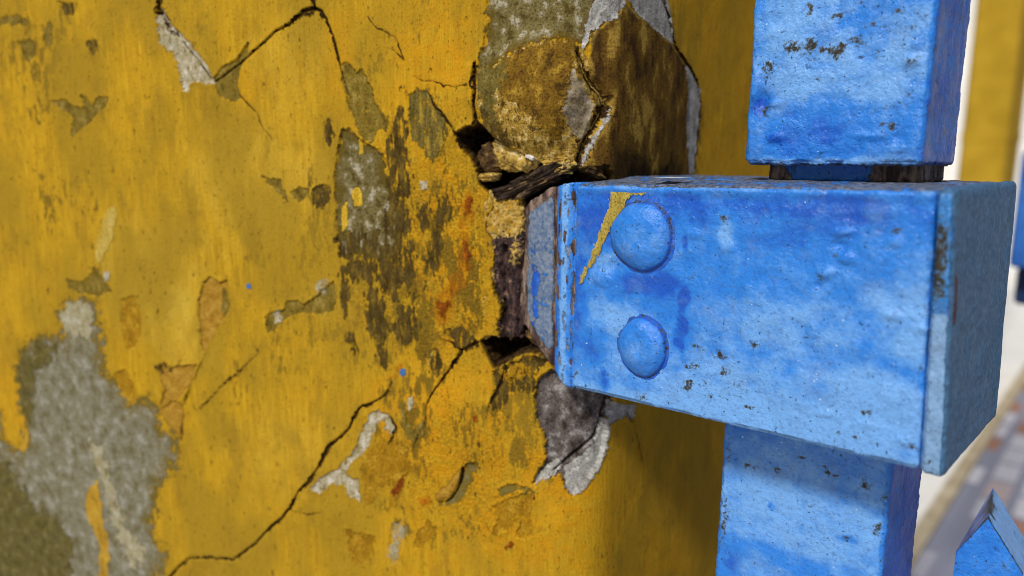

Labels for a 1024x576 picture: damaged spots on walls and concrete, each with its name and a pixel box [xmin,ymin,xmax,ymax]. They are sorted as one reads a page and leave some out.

flaking render [153,0,249,102]
crack [215,0,350,139]
crack [367,16,404,59]
flaking render [475,0,603,169]
water stain [333,86,453,370]
flaking render [0,207,197,576]
peeling [197,277,230,351]
peeling [265,279,336,333]
crack [168,326,479,576]
flaking render [310,397,425,511]
crack [487,340,518,411]
flaking render [490,350,636,549]